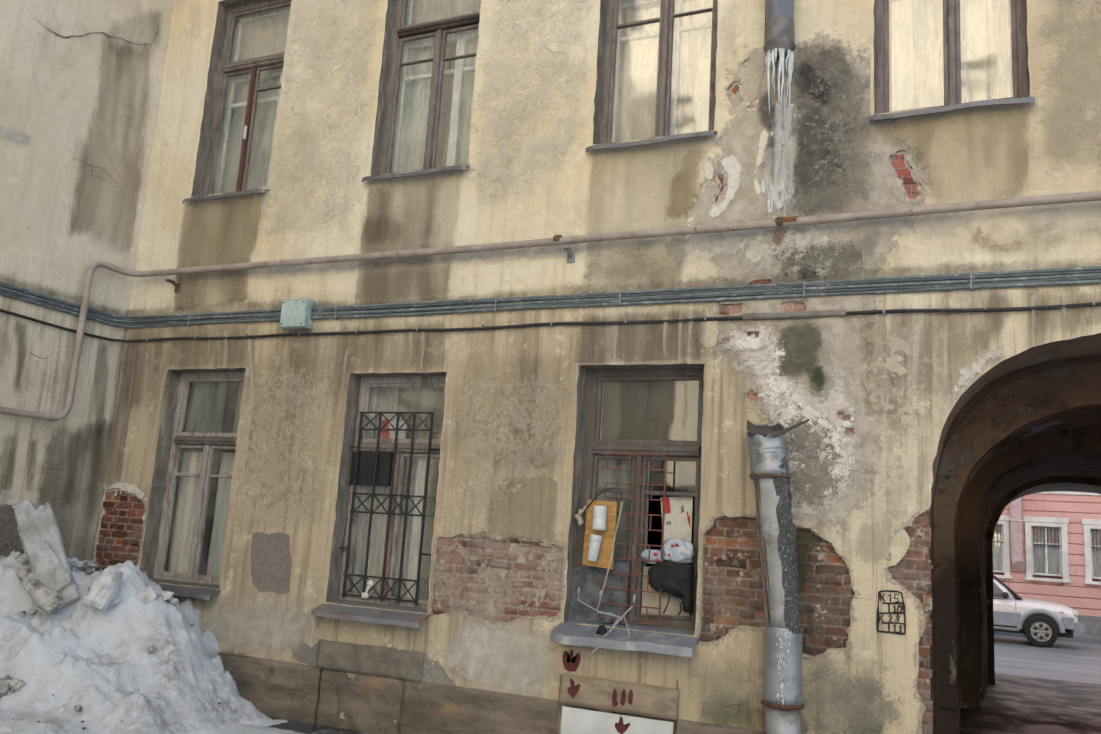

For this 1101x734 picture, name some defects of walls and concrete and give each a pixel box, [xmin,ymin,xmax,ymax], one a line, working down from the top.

crack [39,11,164,47]
leakage [758,40,869,215]
peeling [679,32,933,734]
leakage [4,454,14,488]
leakage [40,444,67,505]
peeling [0,505,25,557]
spalling [91,482,147,571]
spalling [428,528,566,629]